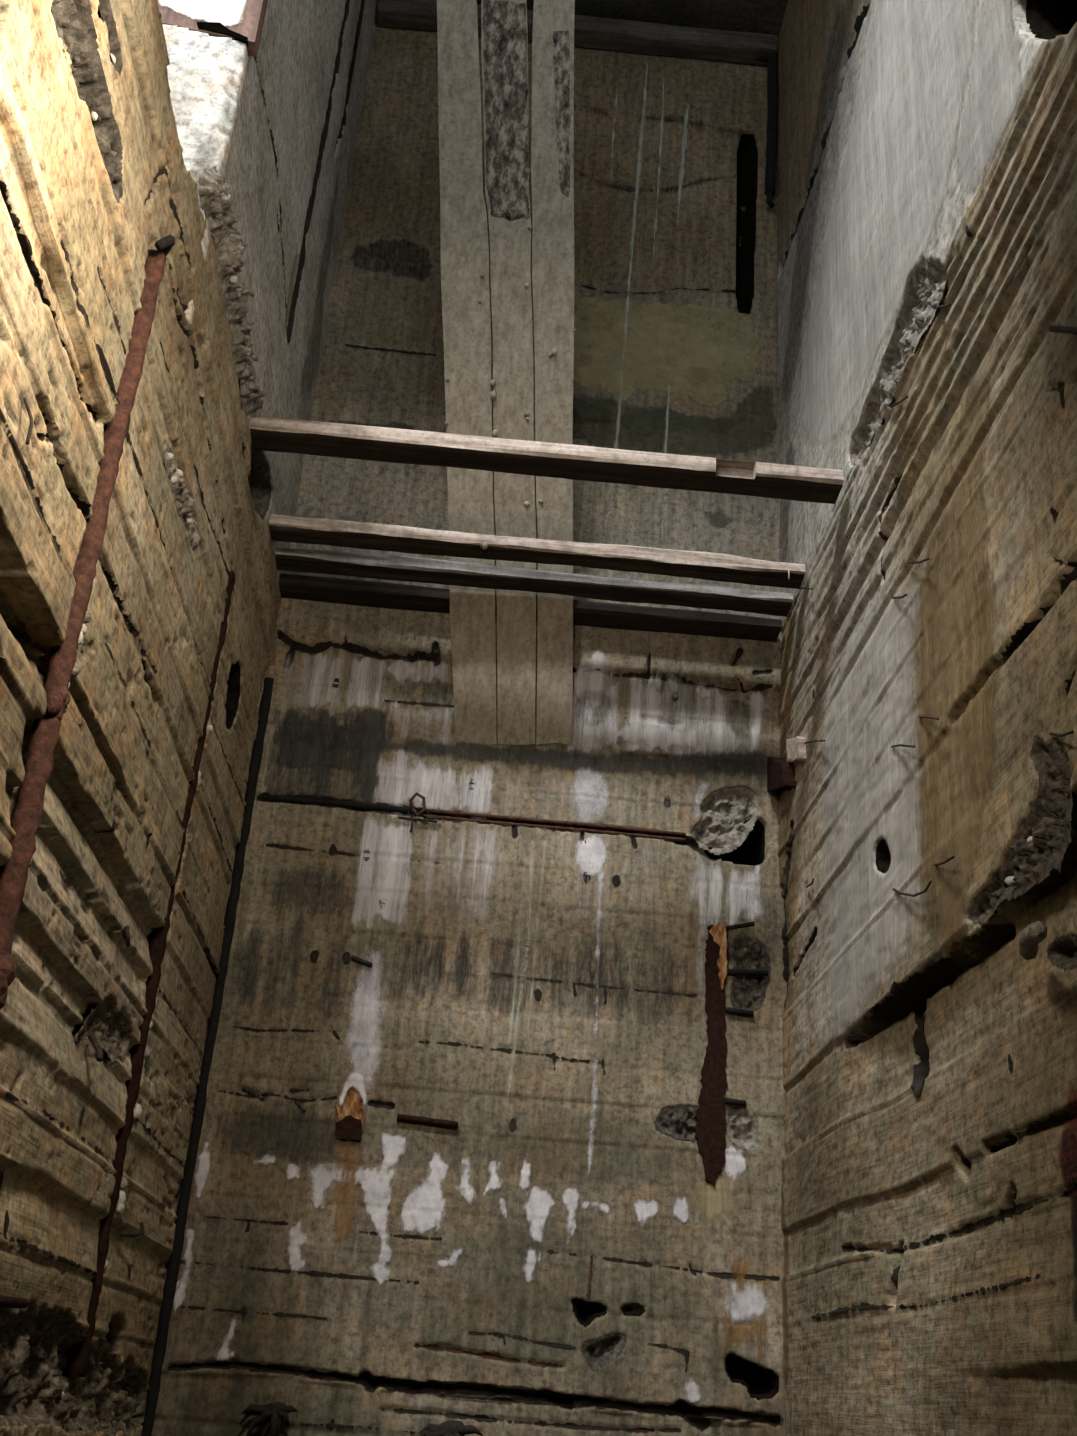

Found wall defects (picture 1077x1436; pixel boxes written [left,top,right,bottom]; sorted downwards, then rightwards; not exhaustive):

hole [1025,0,1077,40]
crack [0,167,736,872]
rust [0,249,166,1010]
leakage [234,650,766,1008]
spalling [691,787,765,866]
spalling [968,735,1077,926]
rust [63,570,235,1377]
rust [691,922,768,1220]
leakage [195,1112,506,1284]
leakage [520,1162,609,1281]
crack [167,1331,781,1434]
spalling [572,1298,646,1372]